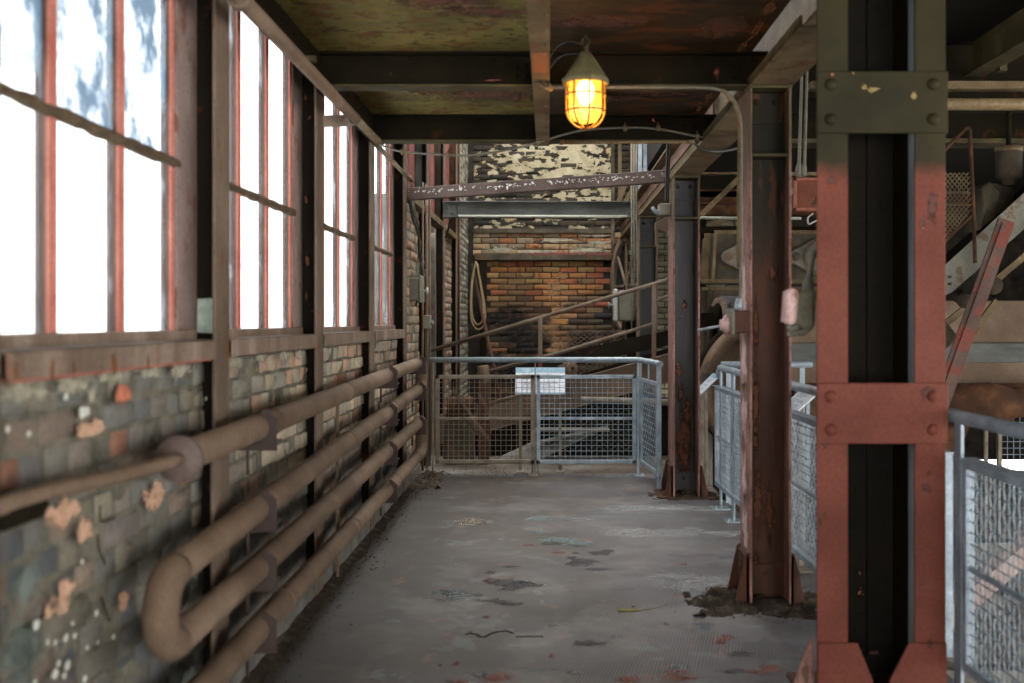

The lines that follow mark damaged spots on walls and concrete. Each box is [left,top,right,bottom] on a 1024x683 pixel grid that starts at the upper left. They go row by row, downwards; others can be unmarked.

peeling [474,144,611,182]
peeling [532,187,611,201]
peeling [474,218,605,229]
spalling [115,384,132,405]
spalling [77,418,106,439]
rust [675,364,693,472]
rust [752,296,774,548]
spalling [142,480,166,512]
spalling [45,497,94,544]
spalling [45,578,77,619]